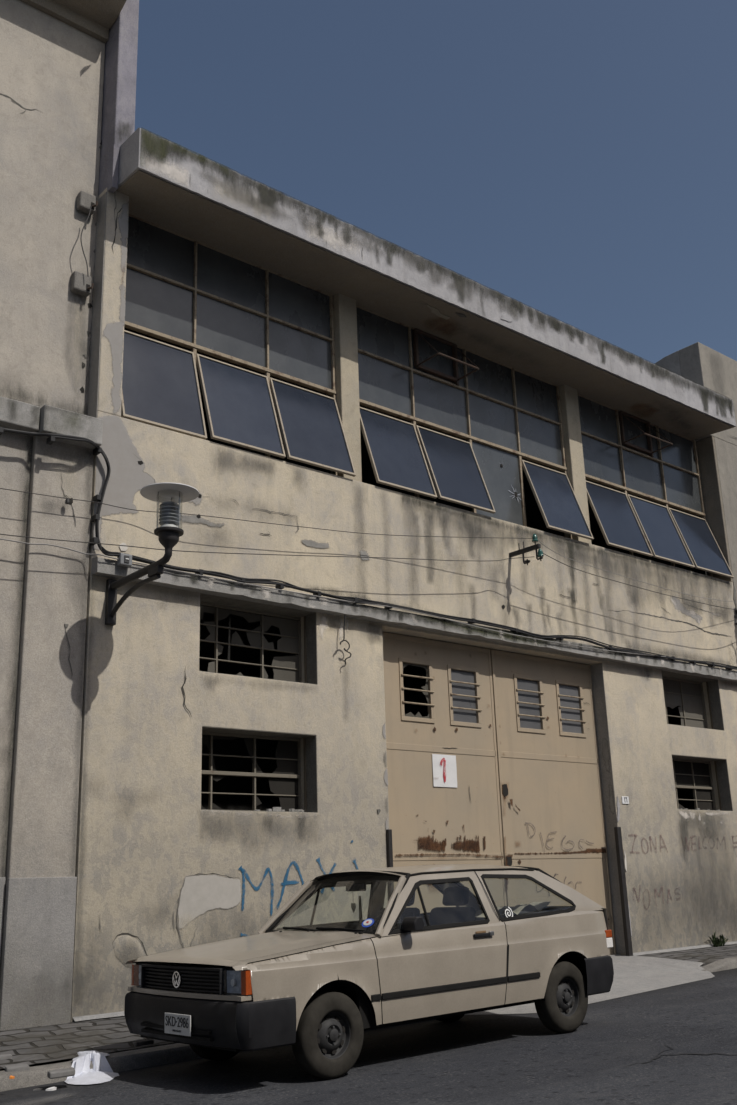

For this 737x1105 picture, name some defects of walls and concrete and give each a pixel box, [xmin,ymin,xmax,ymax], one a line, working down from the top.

water stain [142,130,733,416]
peeling [80,204,156,550]
water stain [353,606,438,622]
water stain [467,626,582,649]
corrosion [396,815,607,890]
peeling [173,873,241,948]